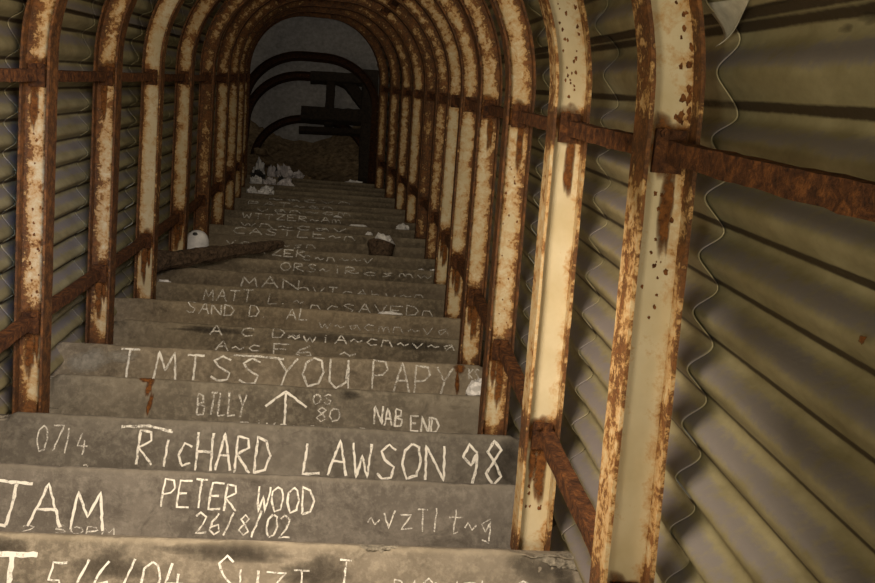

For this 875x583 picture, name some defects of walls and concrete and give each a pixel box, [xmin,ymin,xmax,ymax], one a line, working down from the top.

corrosion [27,58,47,127]
corrosion [509,101,525,171]
corrosion [563,143,575,194]
corrosion [657,173,675,252]
corrosion [489,337,503,407]
corrosion [528,417,554,500]
corrosion [608,574,632,583]